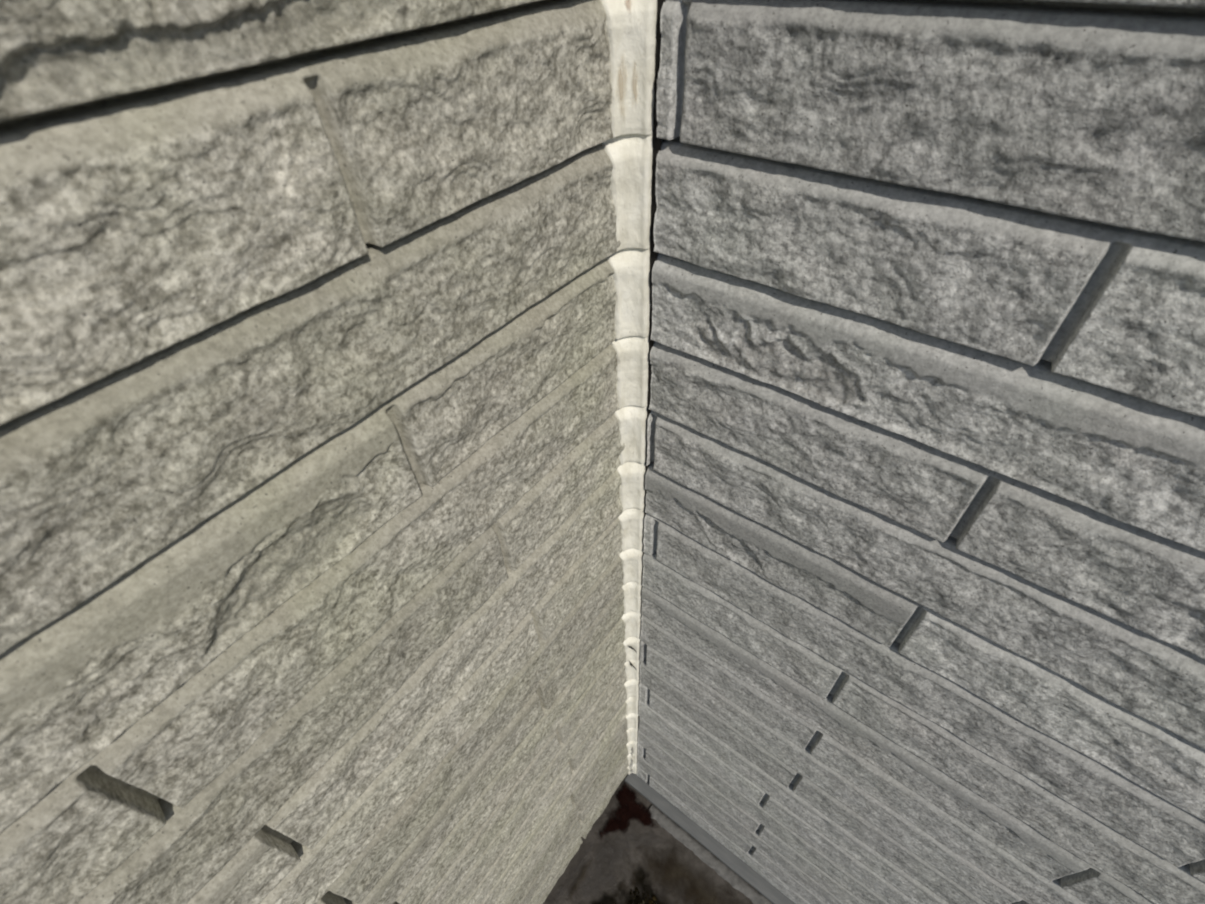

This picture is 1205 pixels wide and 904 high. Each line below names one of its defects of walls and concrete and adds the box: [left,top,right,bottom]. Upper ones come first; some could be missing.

rust [600,783,655,839]